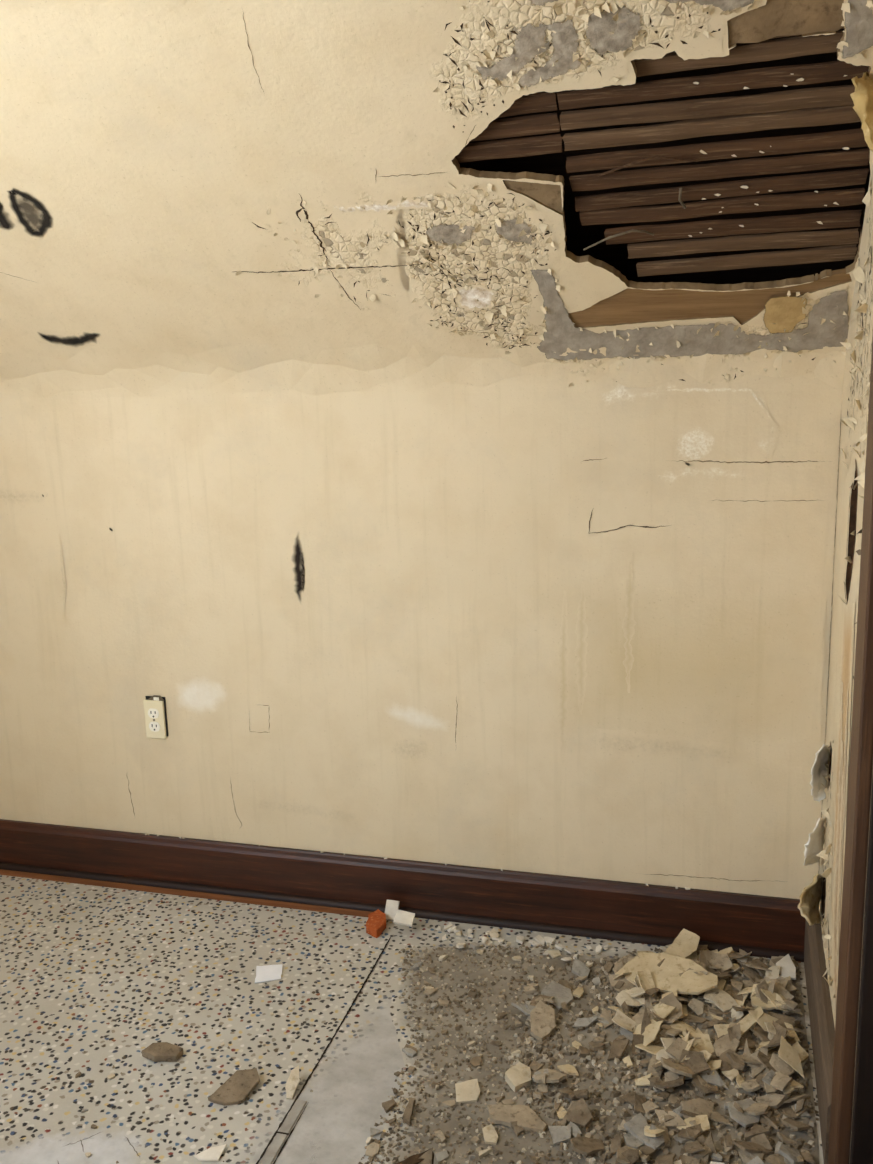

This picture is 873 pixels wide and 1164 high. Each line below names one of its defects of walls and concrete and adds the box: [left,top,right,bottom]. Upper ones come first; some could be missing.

peeling [427,0,763,142]
spalling [837,0,873,152]
crack [234,194,535,336]
peeling [242,171,873,499]
peeling [798,740,835,1026]